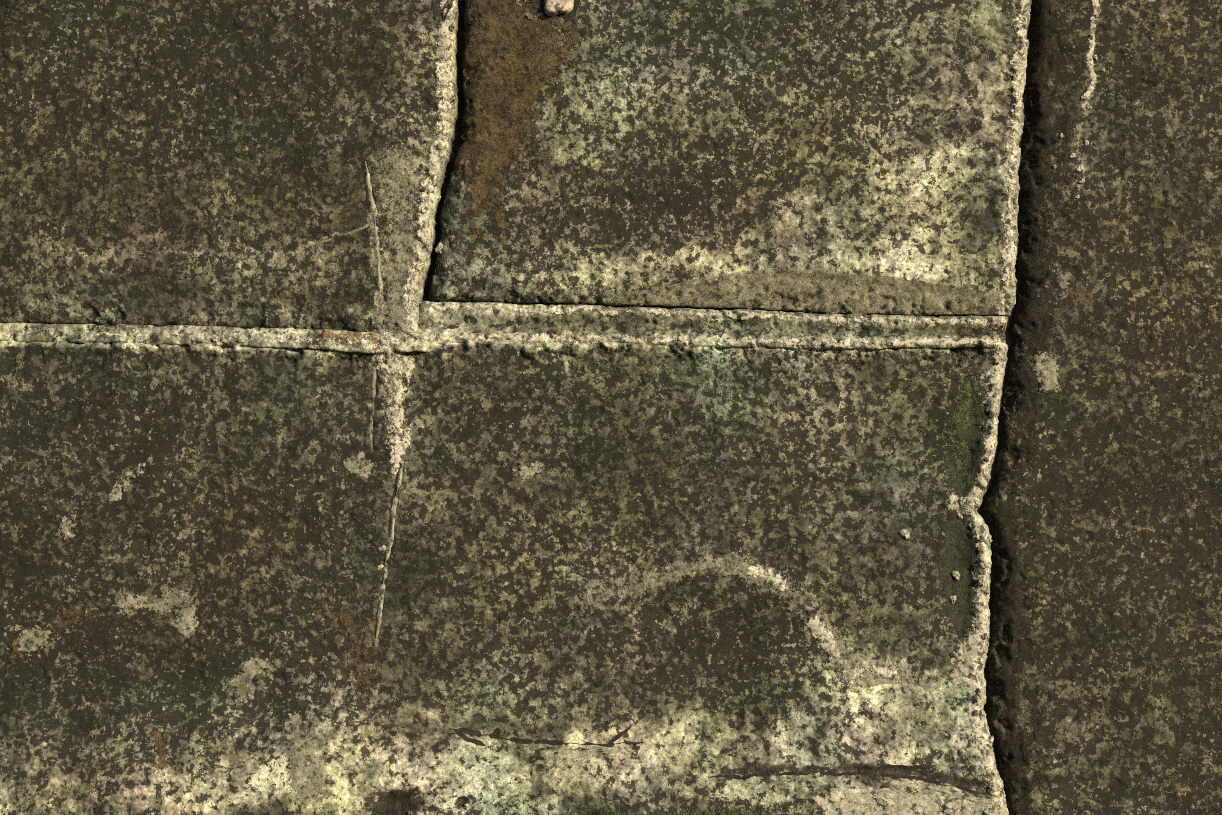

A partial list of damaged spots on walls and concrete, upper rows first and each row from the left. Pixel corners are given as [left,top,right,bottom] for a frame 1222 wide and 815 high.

crack [316,162,386,324]
crack [369,358,404,647]